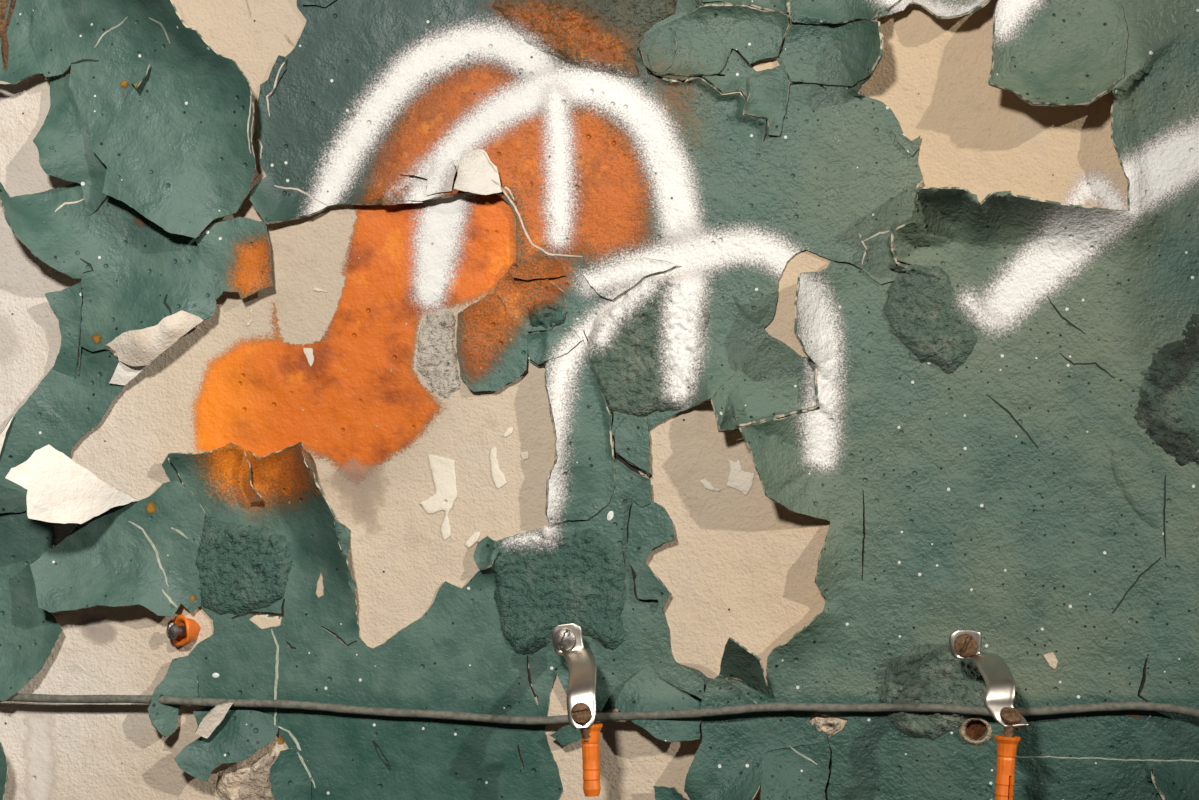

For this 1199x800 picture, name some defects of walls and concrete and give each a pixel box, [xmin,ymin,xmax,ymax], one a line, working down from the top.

peeling [0,0,360,800]
peeling [382,149,502,206]
peeling [304,250,848,800]
peeling [492,0,1128,211]